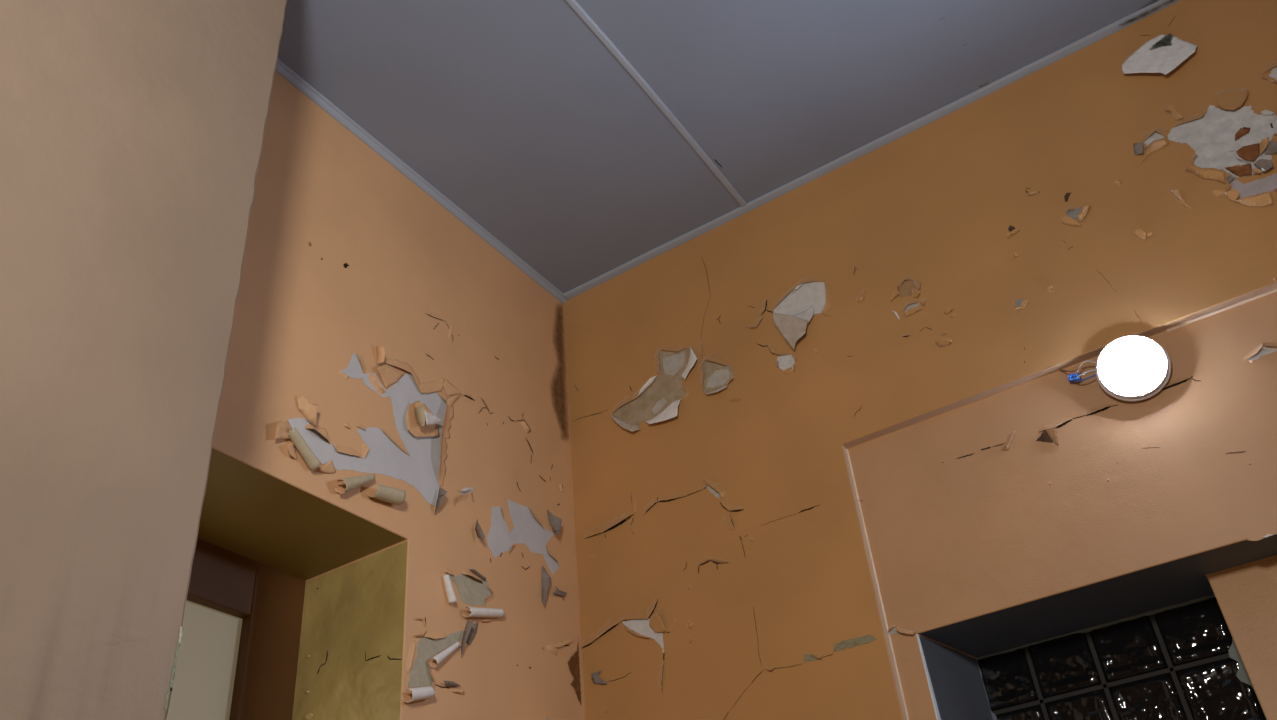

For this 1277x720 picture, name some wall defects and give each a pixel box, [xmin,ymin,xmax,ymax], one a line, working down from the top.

peeling [1122,33,1197,75]
peeling [1133,89,1277,210]
peeling [756,277,832,375]
peeling [275,345,534,515]
peeling [611,340,734,432]
crack [941,403,1119,463]
crack [1162,376,1200,390]
peeling [475,464,567,608]
crack [584,478,819,573]
peeling [402,567,505,703]
crack [581,598,669,694]